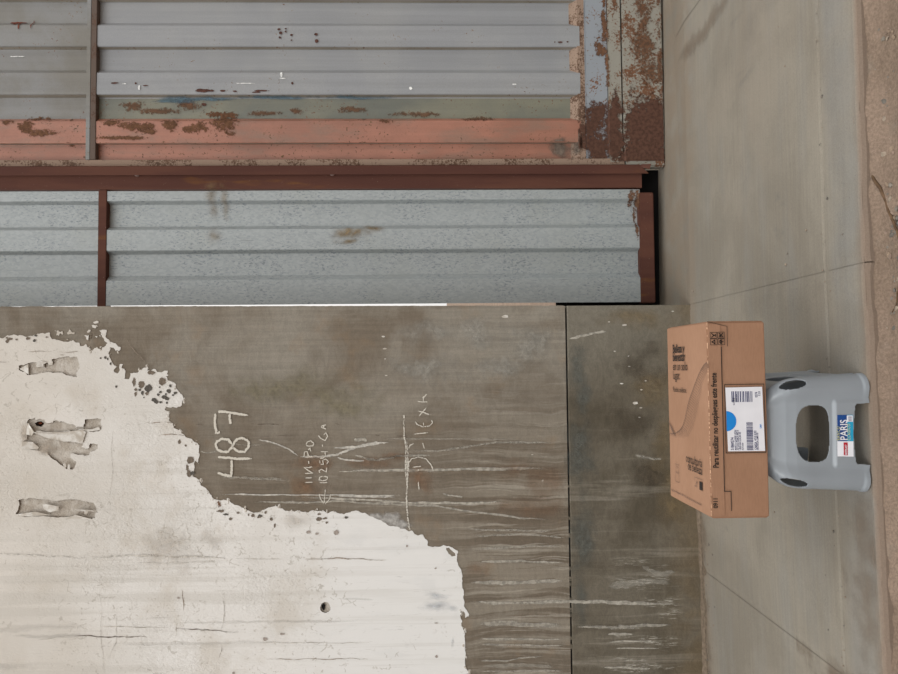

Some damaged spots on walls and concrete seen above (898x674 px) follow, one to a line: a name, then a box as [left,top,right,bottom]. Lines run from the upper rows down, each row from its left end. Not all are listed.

rust [573,0,664,161]
rust [95,95,301,140]
rust [380,111,439,123]
spalling [20,356,80,377]
peeling [5,321,119,368]
spalling [21,418,101,470]
spalling [132,364,300,528]
spalling [16,498,97,519]
leakage [584,624,667,649]